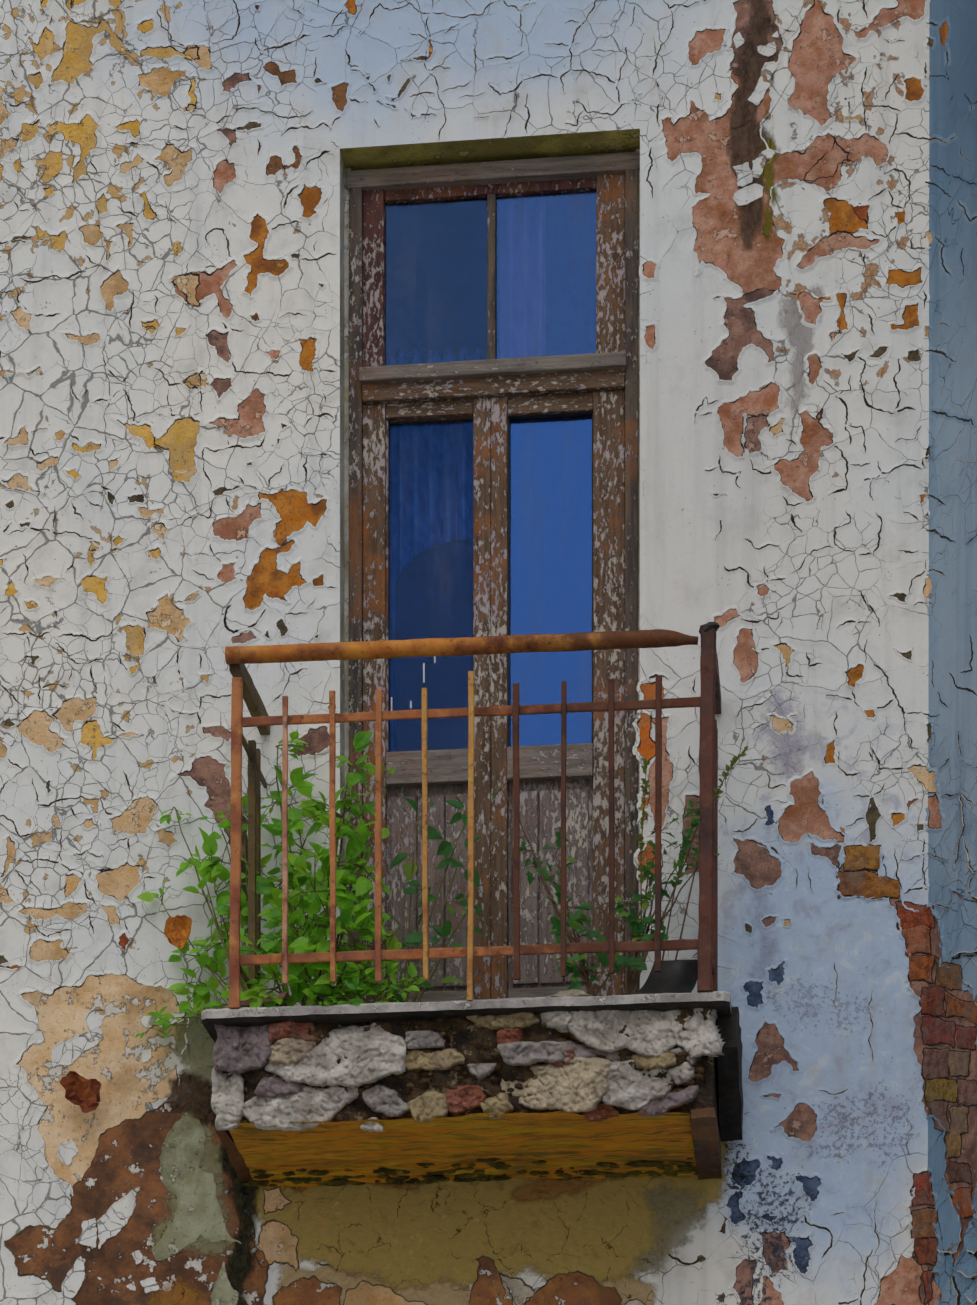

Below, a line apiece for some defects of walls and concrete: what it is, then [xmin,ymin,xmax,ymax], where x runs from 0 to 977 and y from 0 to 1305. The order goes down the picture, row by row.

crack [0,253,338,727]
peeling [110,210,302,487]
crack [115,0,700,270]
water stain [728,0,778,249]
peeling [658,0,952,505]
crack [704,19,977,966]
crack [0,624,176,938]
water stain [166,1072,216,1126]
spalling [4,970,428,1305]
water stain [221,1144,259,1305]
water stain [278,1265,471,1305]
flaking render [713,735,977,1305]